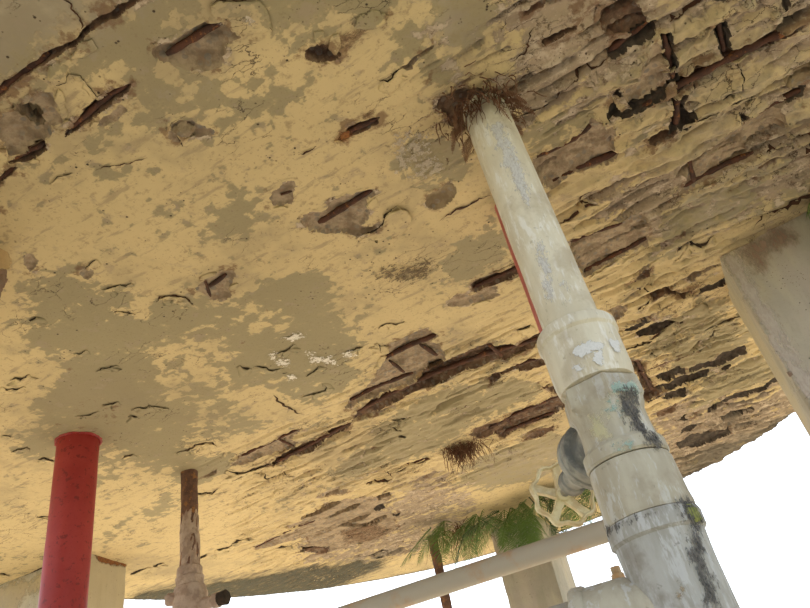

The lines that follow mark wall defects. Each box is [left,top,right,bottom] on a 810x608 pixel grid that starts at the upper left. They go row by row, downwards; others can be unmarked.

spalling [518,0,561,22]
spalling [299,38,348,68]
spalling [0,0,153,212]
spalling [529,0,810,197]
spalling [567,202,652,279]
spalling [191,267,240,304]
peeling [607,262,727,338]
spalling [198,327,545,480]
spalling [467,382,565,441]
spalling [631,344,778,450]